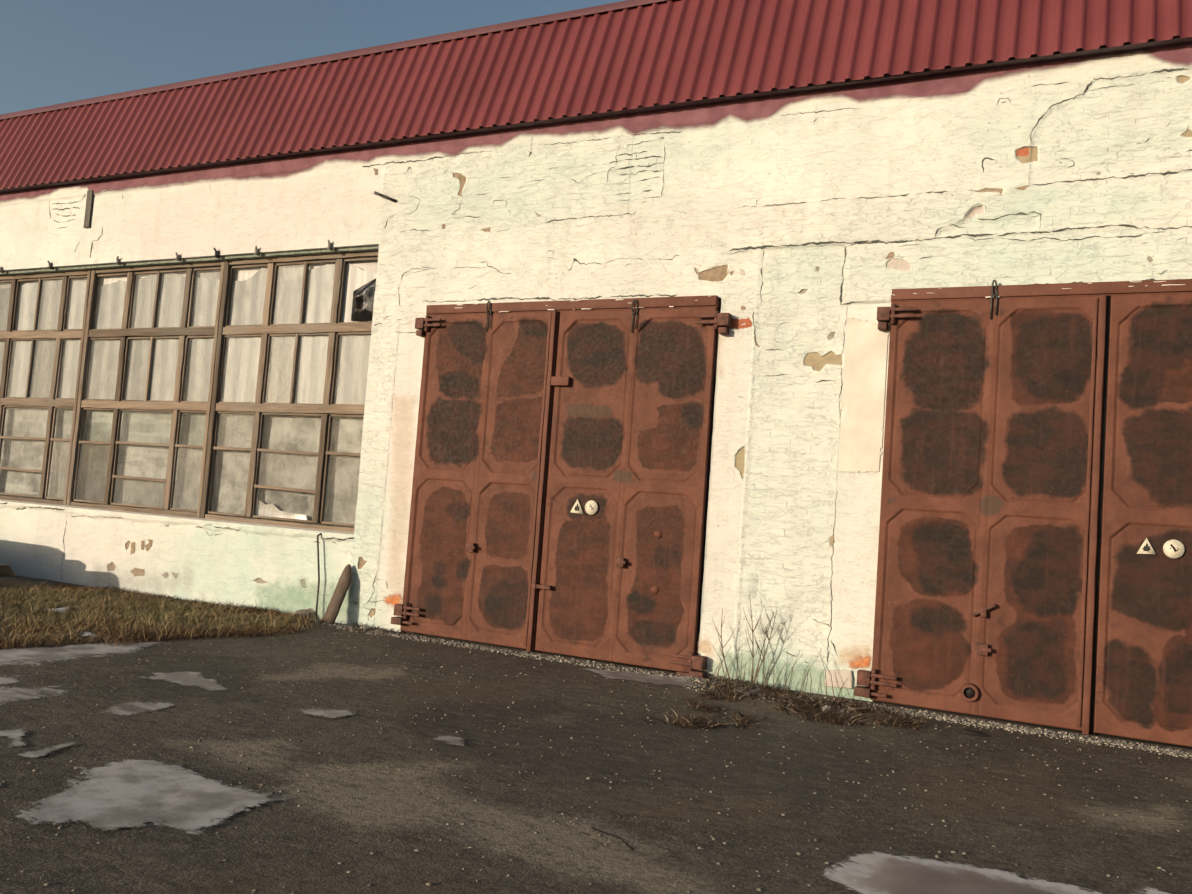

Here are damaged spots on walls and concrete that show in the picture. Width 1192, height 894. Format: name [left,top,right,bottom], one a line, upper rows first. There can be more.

crack [997,68,1185,140]
spalling [1013,144,1040,166]
crack [1033,150,1192,186]
crack [362,151,489,231]
crack [742,191,945,207]
spalling [693,264,745,301]
peeling [802,331,844,374]
peeling [125,539,152,555]
peeling [107,560,144,577]
rust [849,656,870,668]